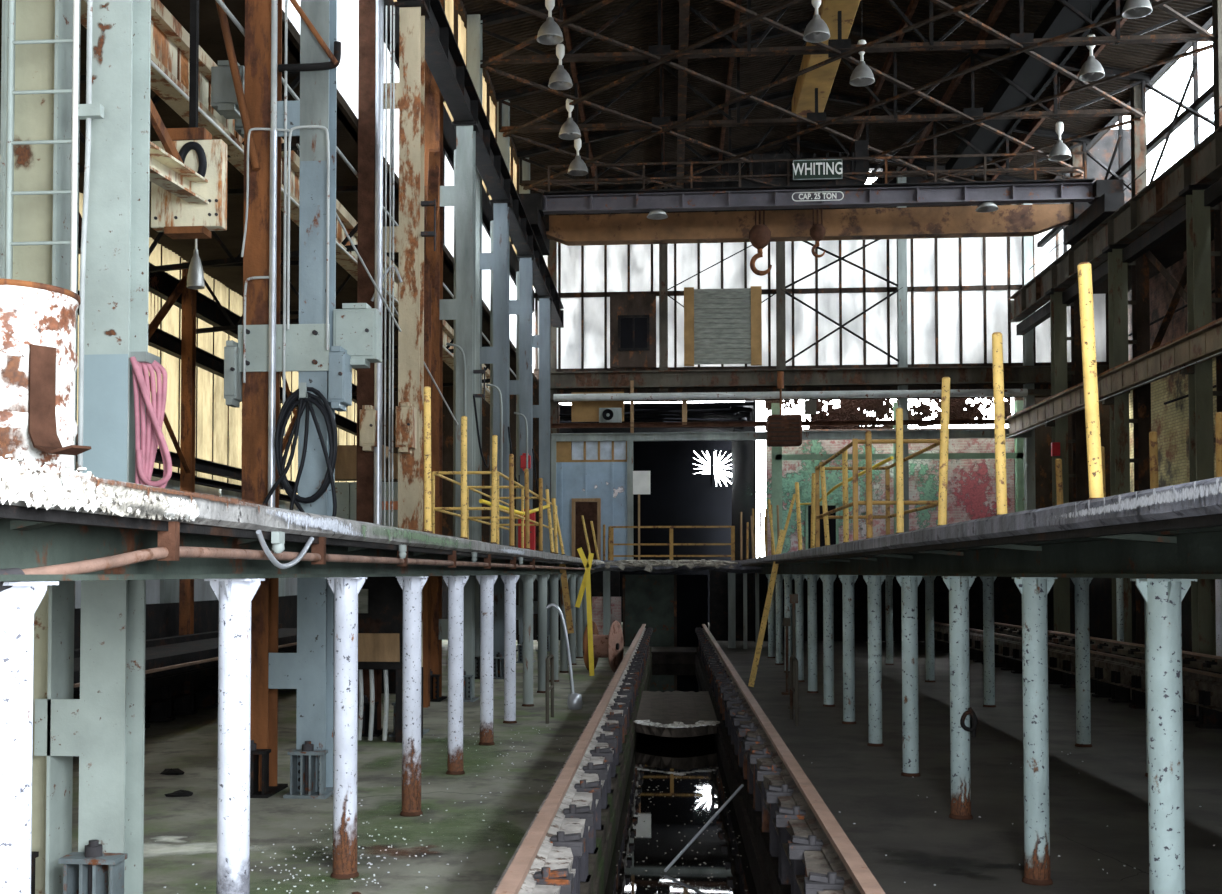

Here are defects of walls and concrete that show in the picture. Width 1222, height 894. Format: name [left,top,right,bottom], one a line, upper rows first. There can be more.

peeling [751,439,894,553]
peeling [909,450,1011,528]
rust [402,740,421,813]
rust [447,747,464,772]
rust [480,723,494,743]
rust [950,780,971,816]
rust [333,795,358,875]
rust [1024,834,1051,880]